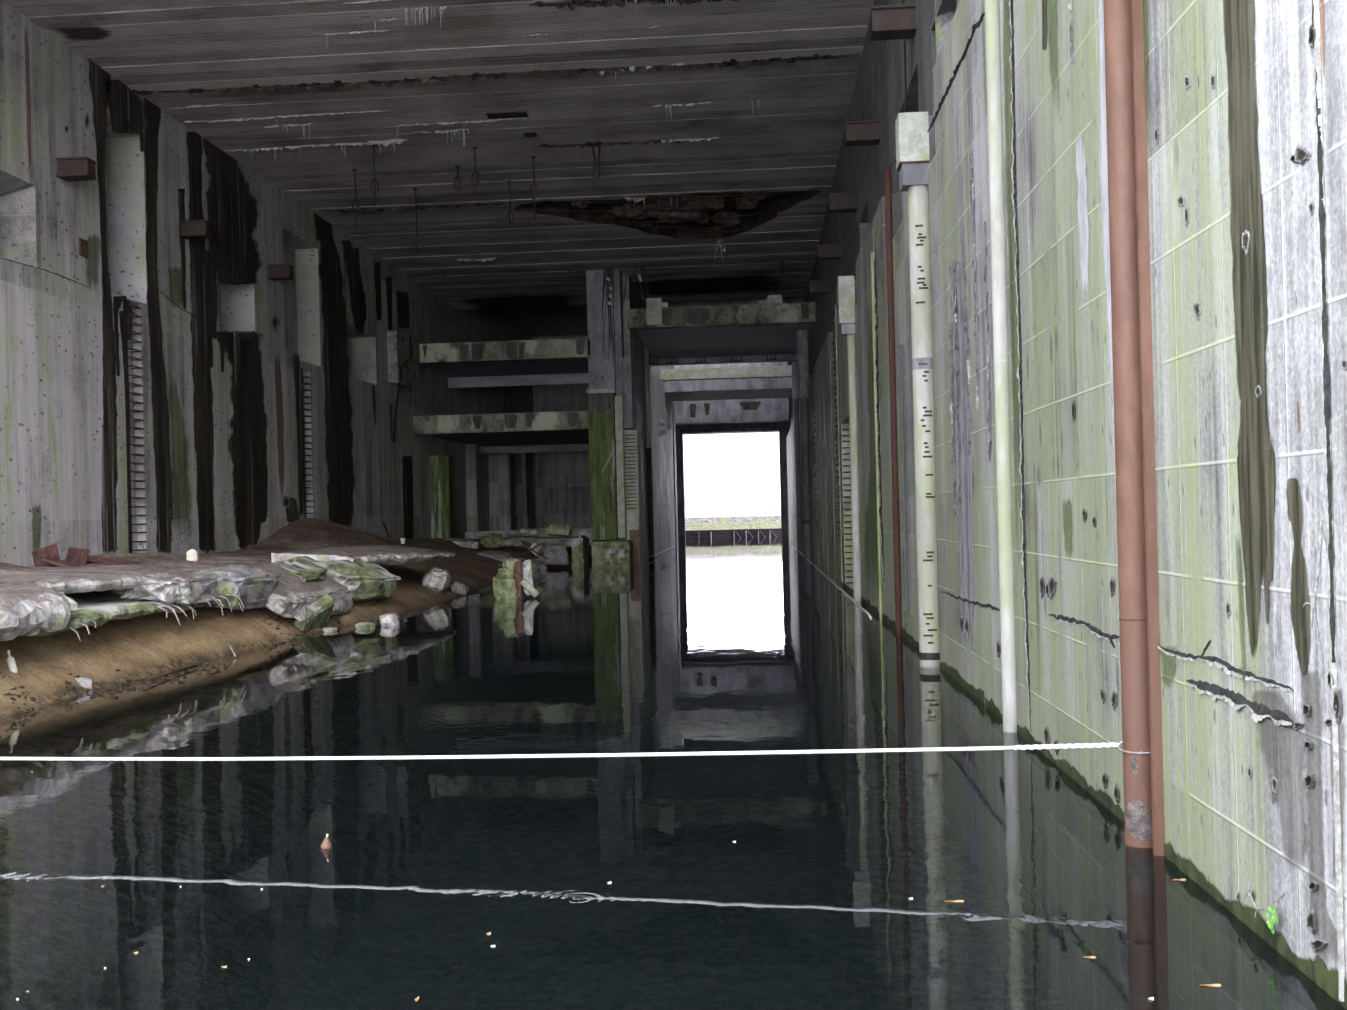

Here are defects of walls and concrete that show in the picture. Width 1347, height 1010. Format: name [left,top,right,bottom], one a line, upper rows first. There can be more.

leakage [52,26,110,41]
spalling [529,0,738,11]
spalling [322,190,821,239]
leakage [87,59,527,553]
peeling [948,151,992,641]
crack [927,0,1120,732]
leakage [1223,0,1310,677]
leakage [1160,648,1175,683]
crack [1158,640,1304,729]